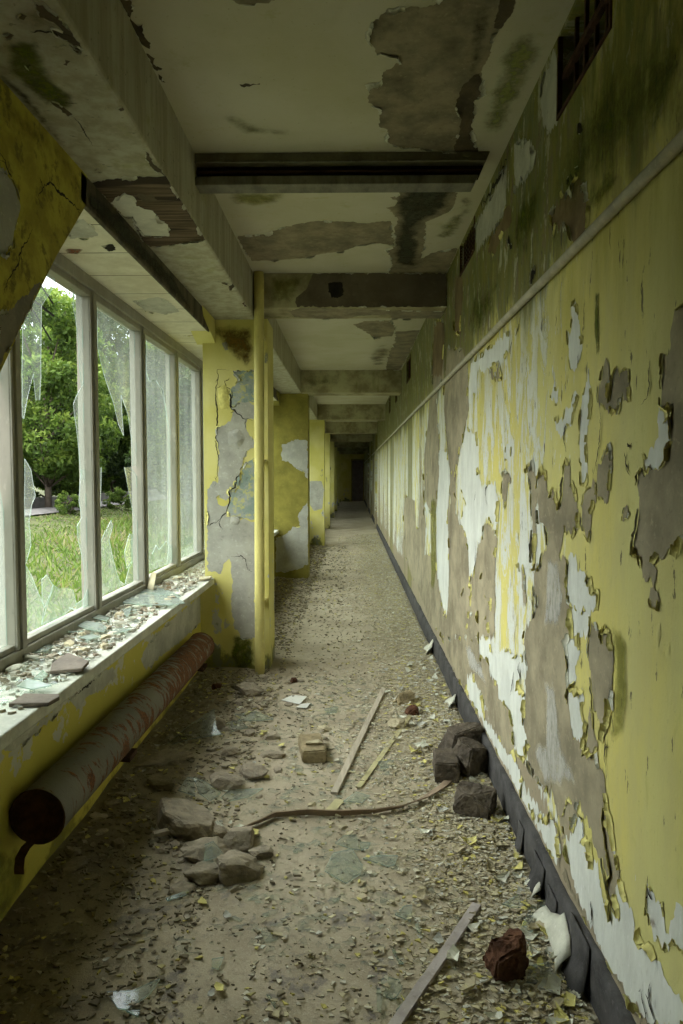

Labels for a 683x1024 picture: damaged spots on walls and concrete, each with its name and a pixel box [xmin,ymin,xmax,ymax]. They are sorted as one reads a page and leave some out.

peeling [365,0,501,154]
flaking render [0,168,21,260]
crack [38,174,79,212]
spalling [93,152,205,247]
mould [218,329,251,362]
crack [210,369,244,527]
flaking render [205,369,255,640]
flaking render [621,302,683,612]
flaking render [236,192,641,1018]
peeling [633,884,683,962]